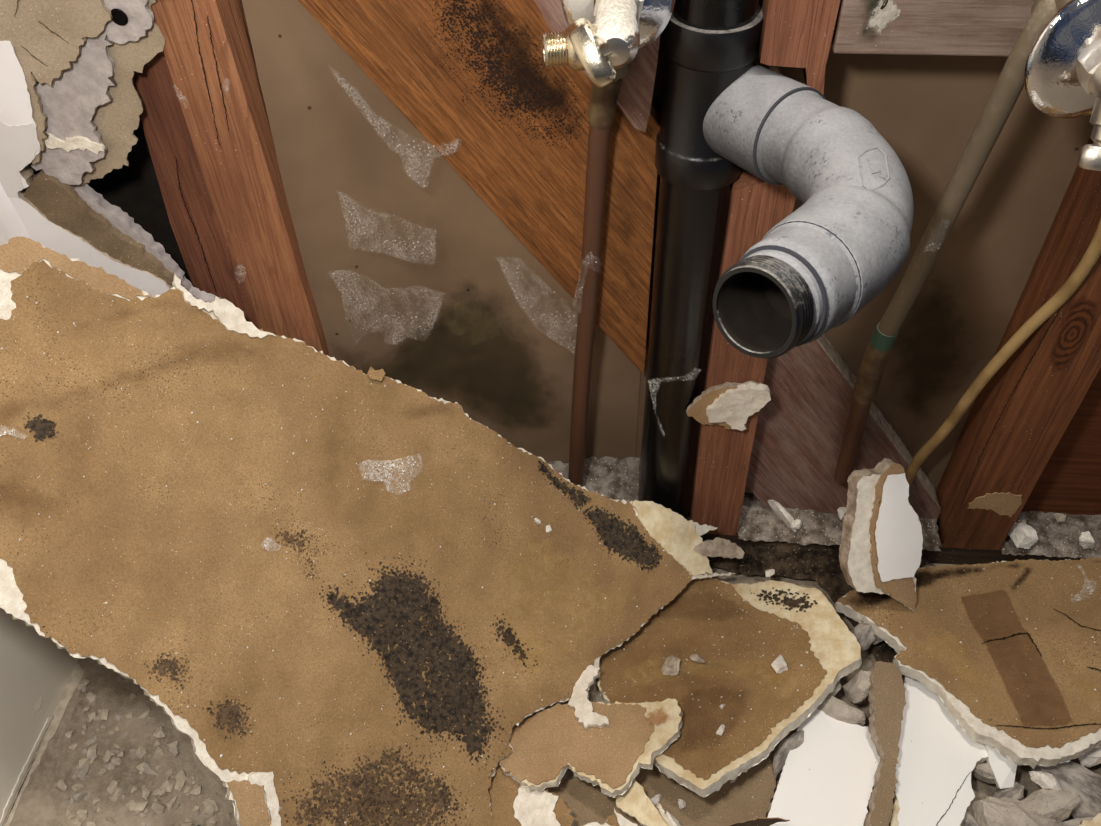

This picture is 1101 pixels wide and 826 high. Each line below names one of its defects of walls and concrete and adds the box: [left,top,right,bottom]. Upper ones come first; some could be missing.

leakage [417,0,589,158]
spalling [0,120,174,284]
leakage [385,305,537,421]
leakage [263,514,512,826]
leakage [490,613,538,673]
crack [981,632,1042,656]